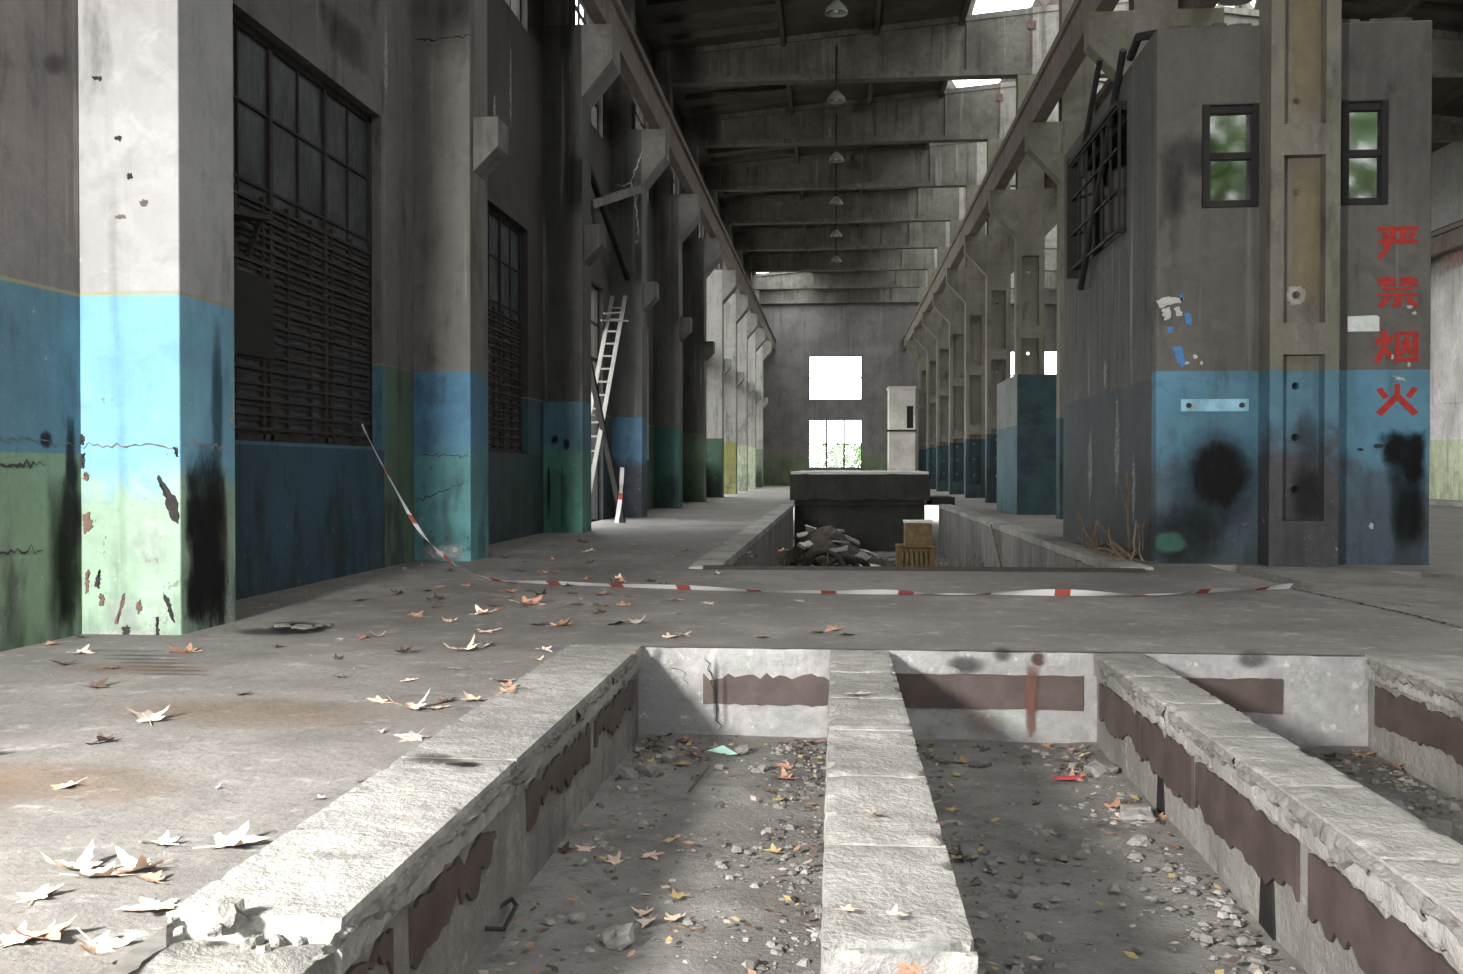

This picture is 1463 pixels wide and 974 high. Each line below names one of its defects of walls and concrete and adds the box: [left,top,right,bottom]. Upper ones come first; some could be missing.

leakage [53,422,82,618]
leakage [187,362,234,623]
spalling [311,646,1463,961]